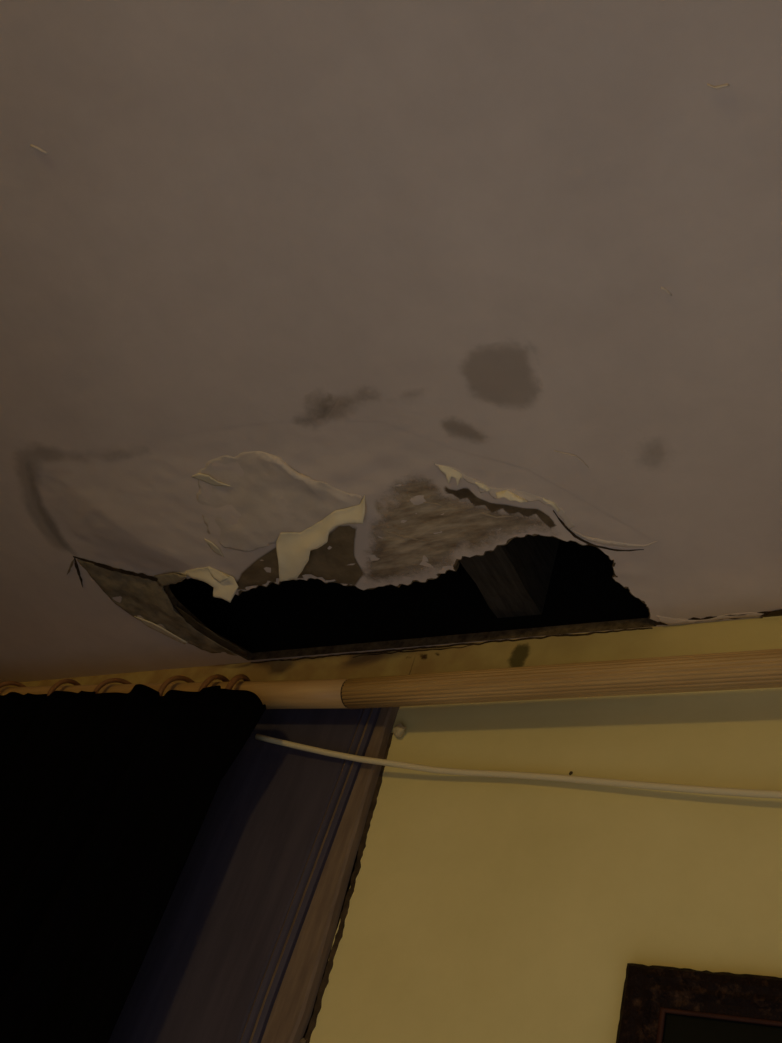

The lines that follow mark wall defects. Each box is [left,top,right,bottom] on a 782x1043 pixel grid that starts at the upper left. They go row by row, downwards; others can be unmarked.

peeling [174,451,657,602]